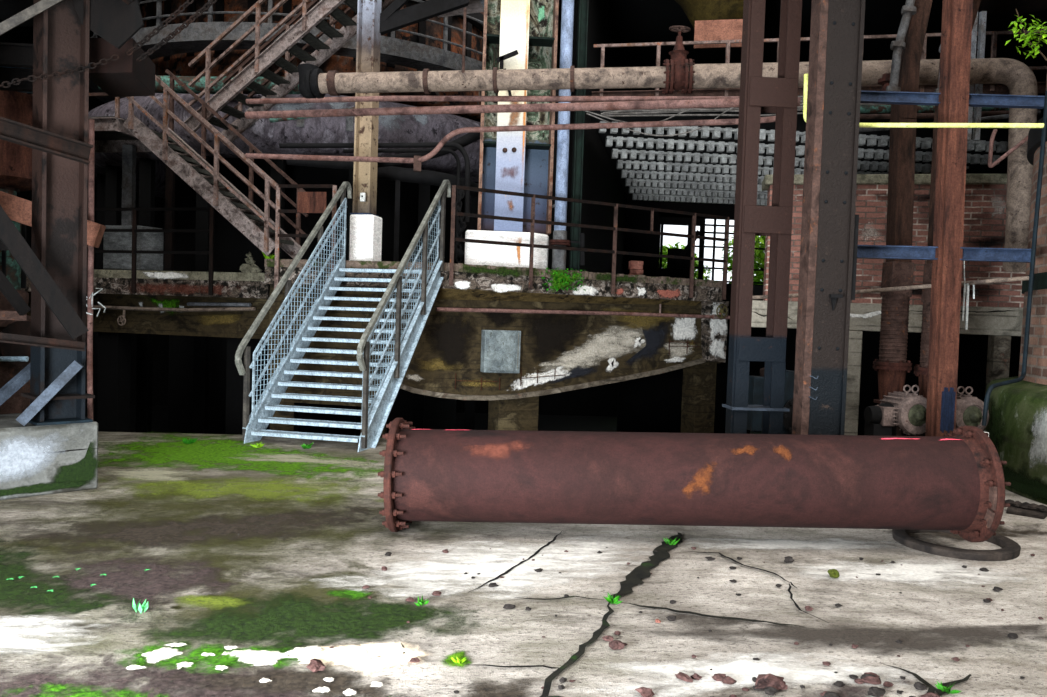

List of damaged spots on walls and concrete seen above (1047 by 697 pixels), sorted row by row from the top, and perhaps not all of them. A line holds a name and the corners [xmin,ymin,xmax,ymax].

corrosion [509,90,526,154]
efflorescence [1031,413,1047,462]
leakage [0,440,85,497]
corrosion [683,466,713,492]
crack [469,531,826,697]